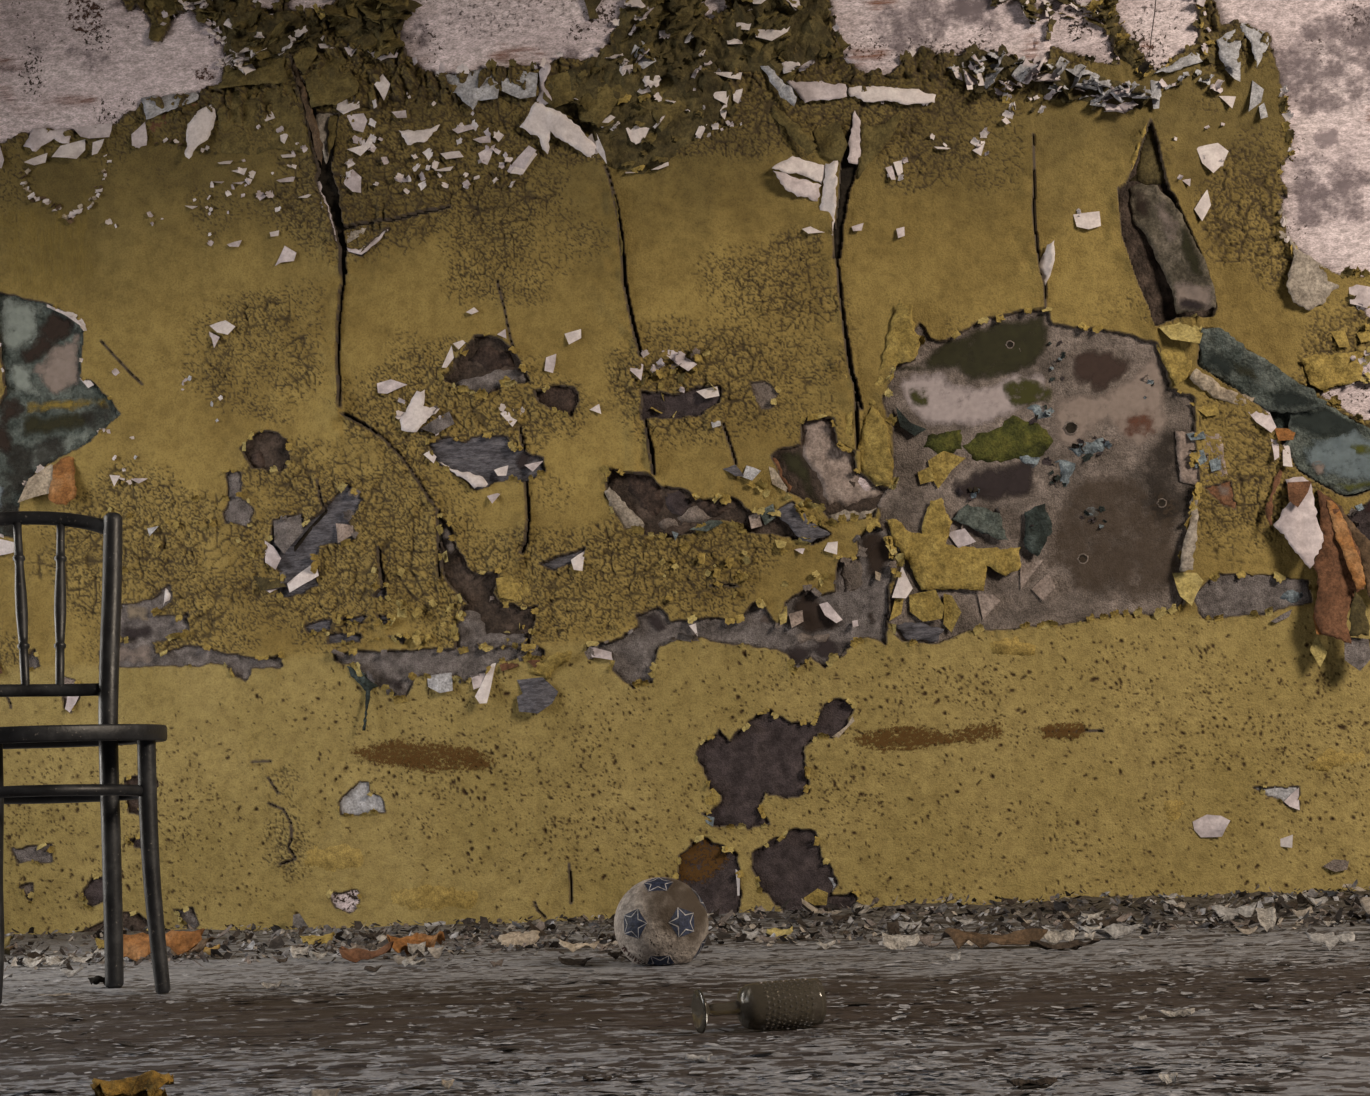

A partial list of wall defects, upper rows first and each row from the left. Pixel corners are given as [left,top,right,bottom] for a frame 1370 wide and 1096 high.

crack [294,485,328,551]
crack [217,46,450,375]
crack [378,549,386,583]
crack [345,414,442,577]
crack [508,102,643,357]
crack [646,421,655,475]
peeling [0,0,1370,731]
crack [760,66,903,485]
crack [1033,136,1046,299]
peeling [672,698,861,914]